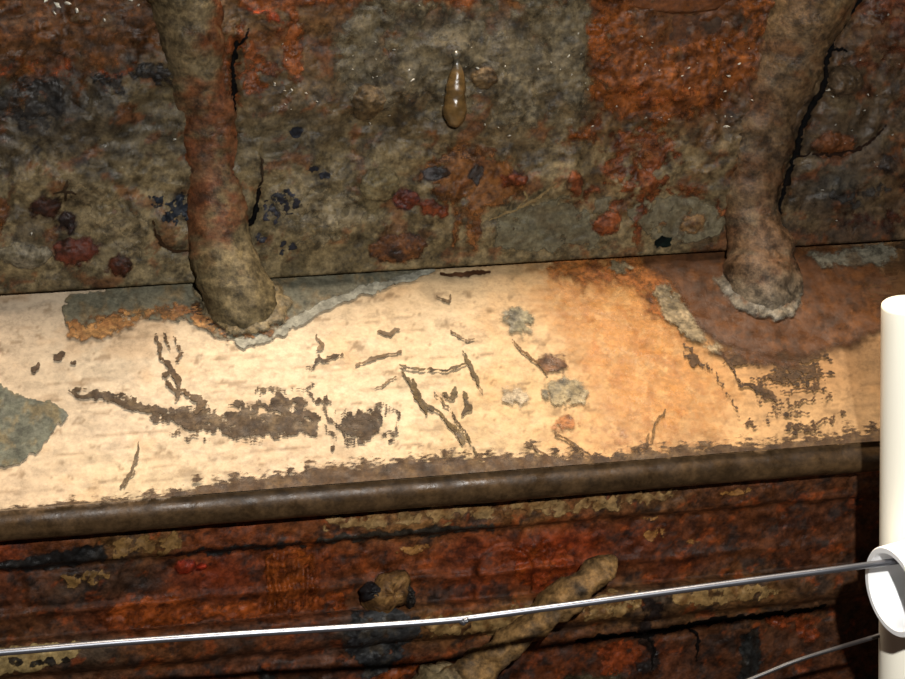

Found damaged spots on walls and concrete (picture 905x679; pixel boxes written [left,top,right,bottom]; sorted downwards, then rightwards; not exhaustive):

corrosion [0,0,160,115]
crack [230,28,249,111]
crack [778,0,887,215]
crack [248,156,264,226]
corrosion [392,142,528,252]
corrosion [545,0,905,432]
peeling [62,264,502,349]
peeling [306,353,344,369]
water stain [536,353,590,430]
water stain [683,343,846,436]
peeling [0,383,880,510]
corrosion [104,549,348,631]